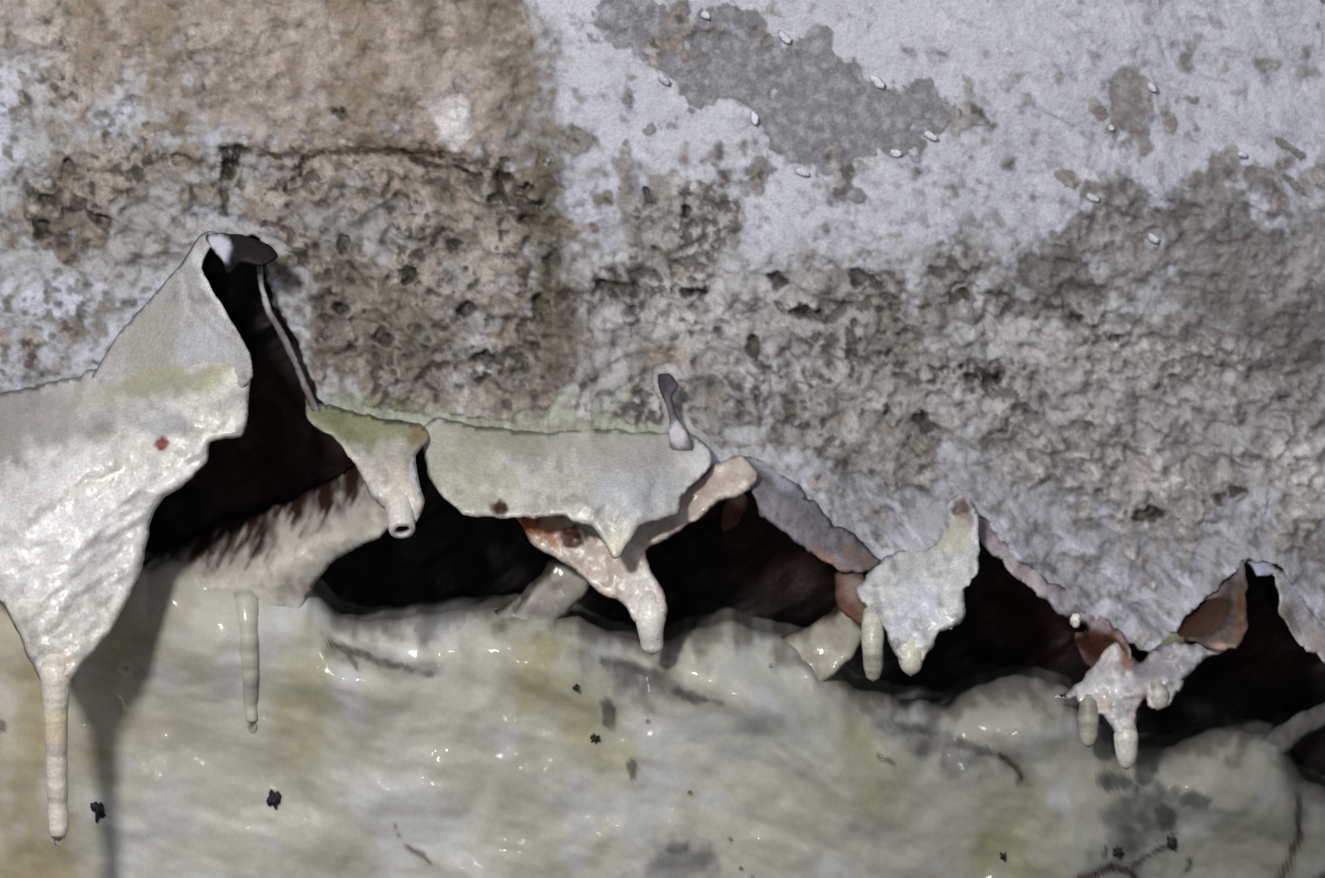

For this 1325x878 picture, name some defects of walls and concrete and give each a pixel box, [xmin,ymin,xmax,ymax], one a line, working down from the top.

flaking render [18,89,31,105]
flaking render [31,15,158,129]
flaking render [151,27,253,108]
damp [71,0,555,199]
peeling [591,0,996,203]
peeling [1089,63,1176,156]
flaking render [1254,57,1279,71]
damp [59,164,116,199]
flaking render [989,137,1325,571]
flaking render [0,108,1251,846]
peeling [1246,559,1325,663]
damp [0,464,1325,878]